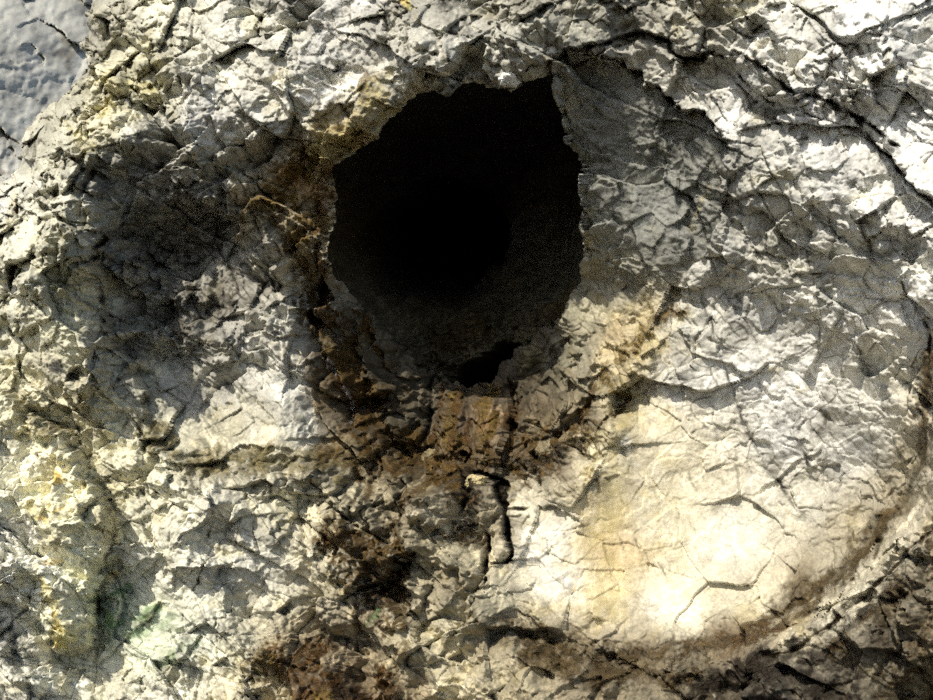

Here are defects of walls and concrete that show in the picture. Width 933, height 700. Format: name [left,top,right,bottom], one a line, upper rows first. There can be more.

crack [546,31,715,70]
peeling [299,83,336,111]
crack [661,92,736,151]
crack [700,0,933,206]
leakage [293,288,326,341]
crack [418,375,436,451]
leakage [305,293,688,545]
crack [507,367,546,446]
crack [440,451,524,583]
leakage [311,515,415,639]
leakage [838,556,858,585]
leakage [733,594,822,647]